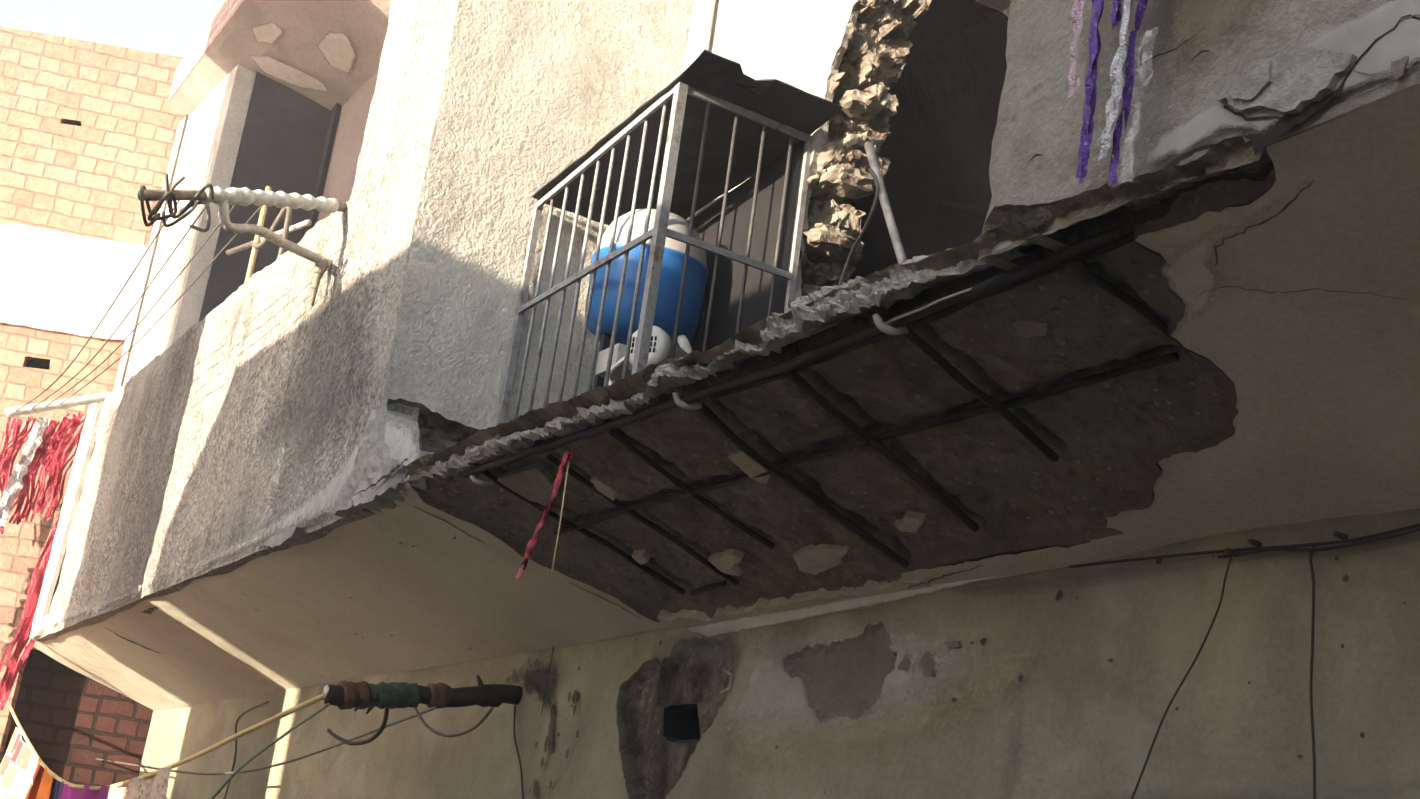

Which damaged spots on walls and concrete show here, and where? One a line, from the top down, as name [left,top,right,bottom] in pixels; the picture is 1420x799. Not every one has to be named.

peeling [249,22,328,92]
peeling [317,32,355,73]
crack [1223,14,1420,155]
crack [1195,181,1410,301]
spalling [333,0,1276,799]